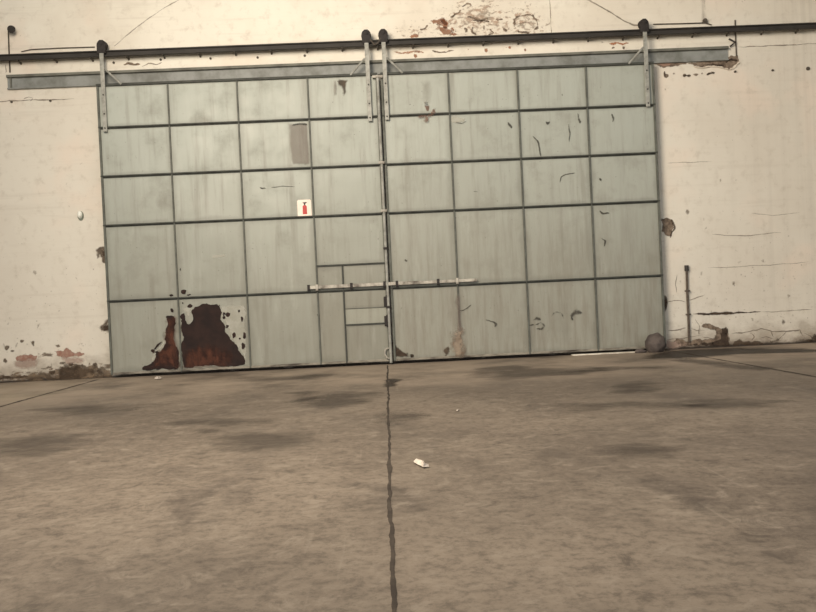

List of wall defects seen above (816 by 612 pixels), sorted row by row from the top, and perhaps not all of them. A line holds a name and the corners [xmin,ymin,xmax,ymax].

peeling [411,3,538,38]
spalling [657,55,740,78]
rust [142,290,246,371]
spalling [0,340,111,381]